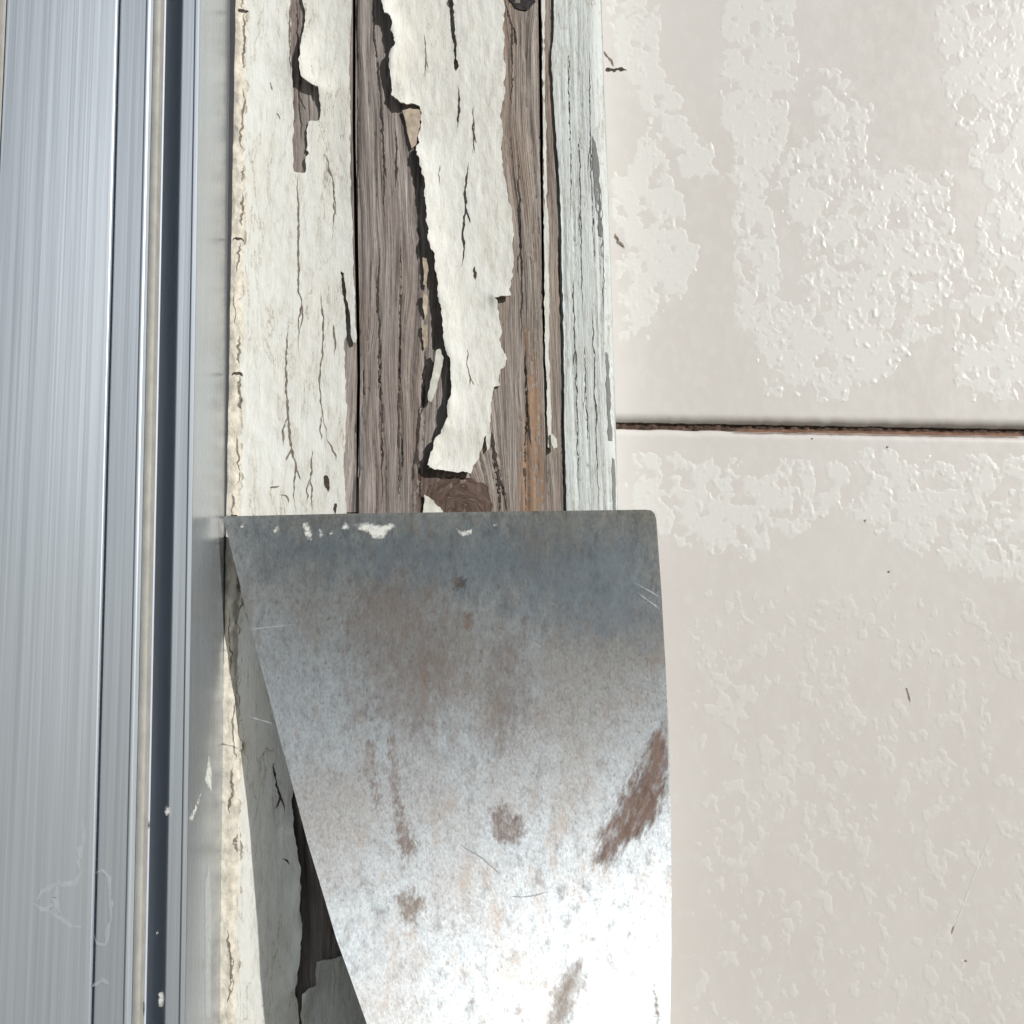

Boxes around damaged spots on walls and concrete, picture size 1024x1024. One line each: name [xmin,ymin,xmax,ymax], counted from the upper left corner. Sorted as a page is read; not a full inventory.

crack [270,178,337,508]
peeling [290,0,321,173]
crack [325,155,336,238]
peeling [333,0,557,514]